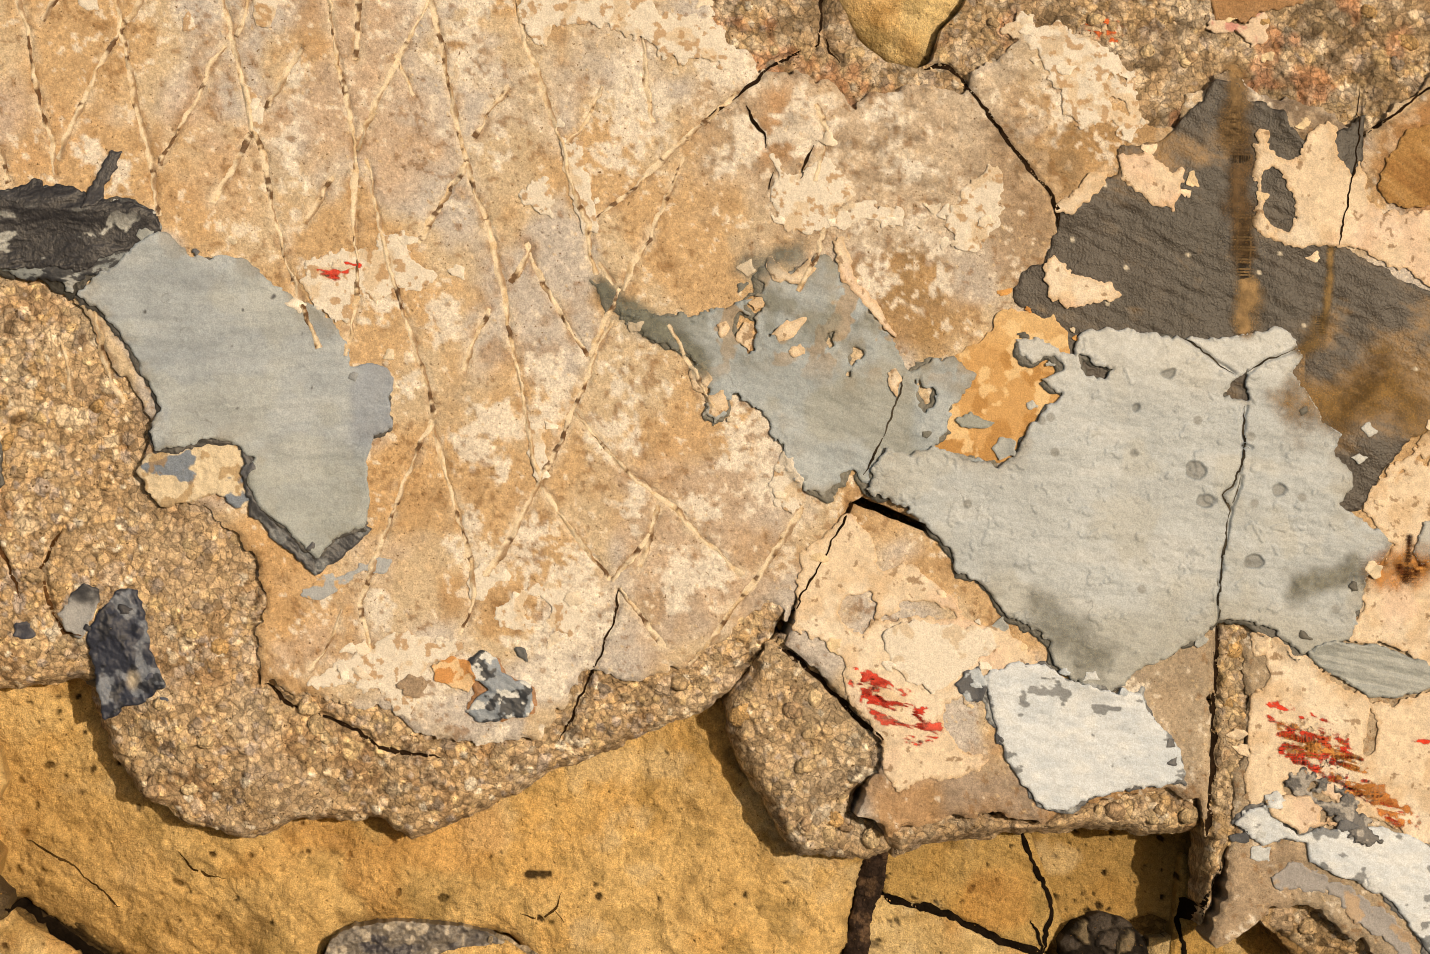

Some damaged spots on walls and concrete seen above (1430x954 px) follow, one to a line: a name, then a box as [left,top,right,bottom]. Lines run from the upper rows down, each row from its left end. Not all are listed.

peeling [78,0,99,10]
peeling [244,83,264,138]
crack [924,63,1060,227]
crack [1339,87,1430,245]
crack [16,0,840,743]
water stain [1282,370,1420,424]
crack [0,528,81,636]
spalling [0,150,785,839]
crack [775,377,903,740]
peeling [517,0,1430,954]
crack [267,683,441,758]
crack [881,833,1054,954]